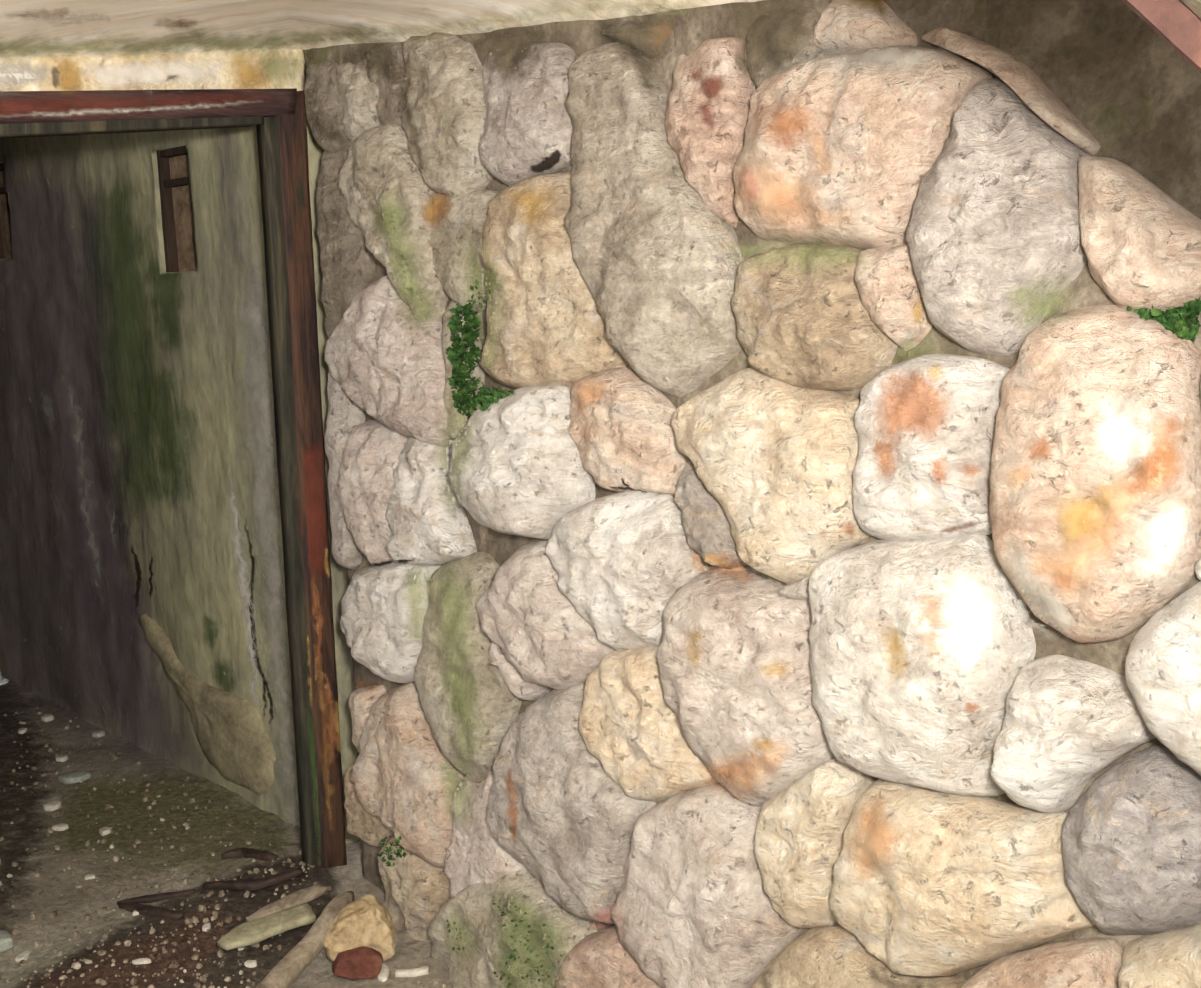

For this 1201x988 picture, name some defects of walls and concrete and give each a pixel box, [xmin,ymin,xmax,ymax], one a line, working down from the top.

leakage [0,168,185,758]
crack [131,547,153,607]
crack [245,525,273,723]
corrosion [303,450,328,573]